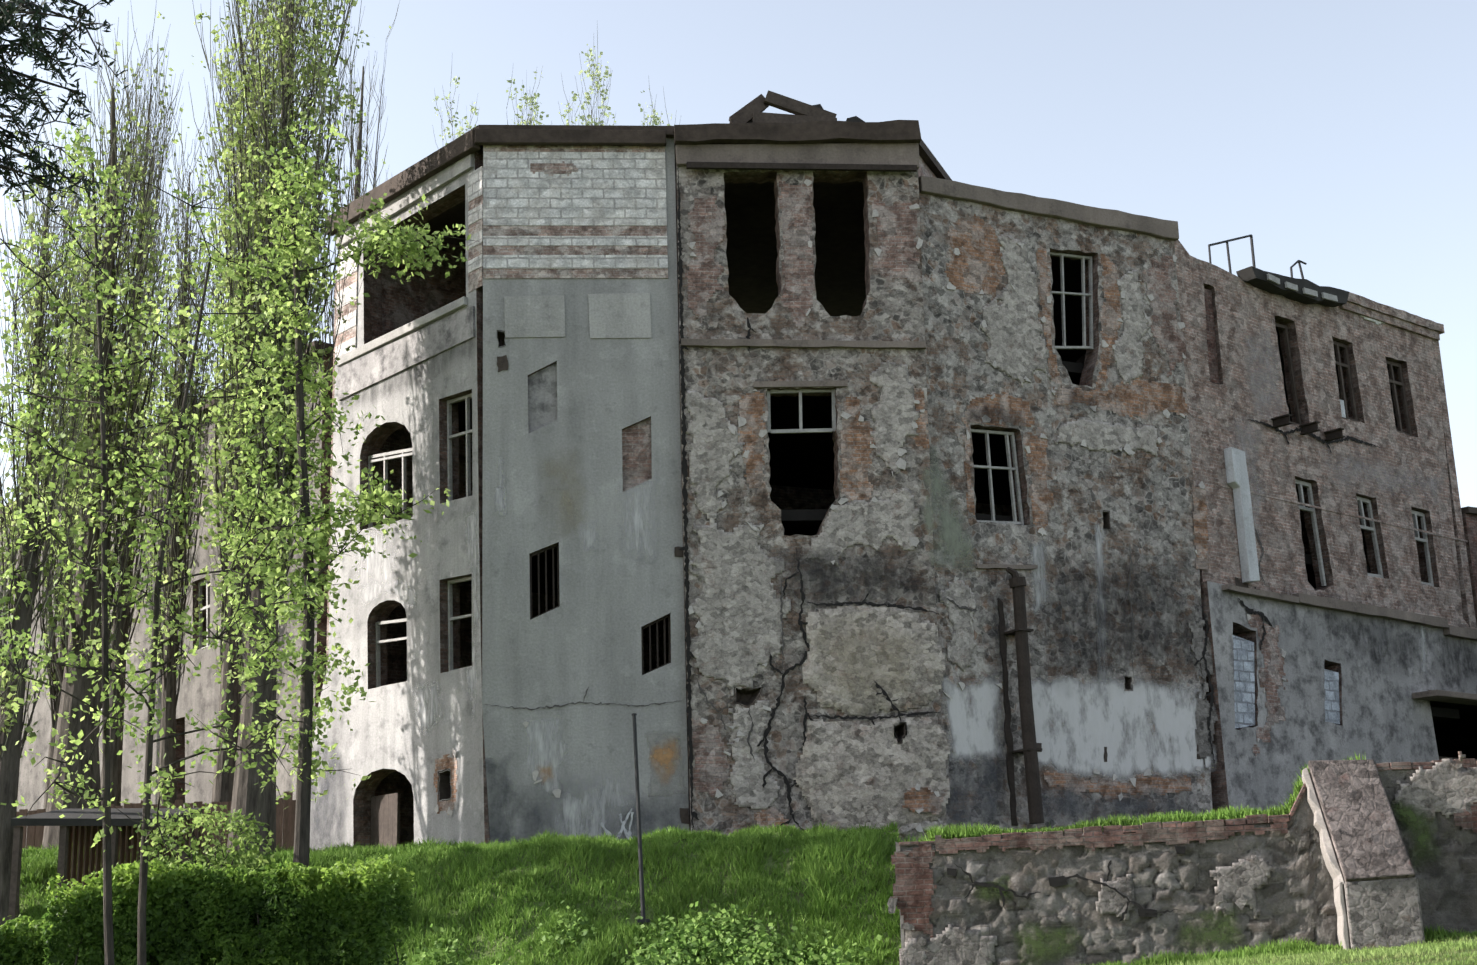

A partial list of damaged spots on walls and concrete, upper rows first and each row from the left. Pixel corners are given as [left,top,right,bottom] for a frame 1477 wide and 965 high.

flaking render [945,214,1190,536]
crack [485,170,978,831]
peeling [1031,614,1218,802]
flaking render [434,748,458,817]
flaking render [522,719,566,798]
flaking render [1392,751,1477,832]
crack [954,860,1178,922]